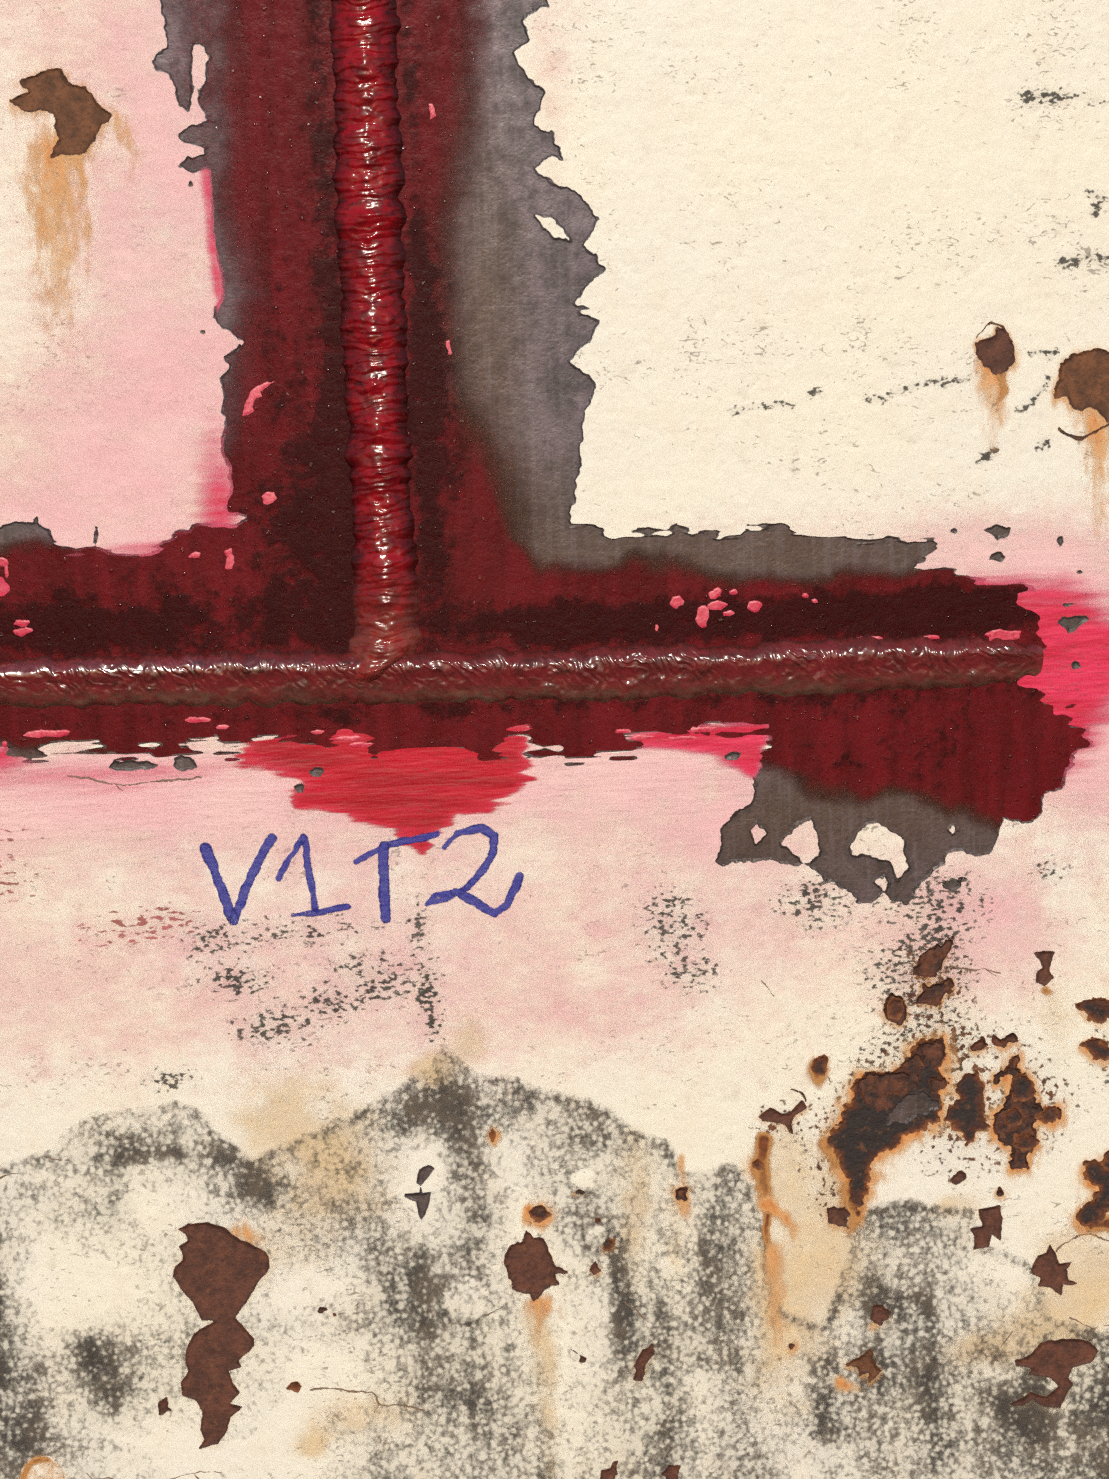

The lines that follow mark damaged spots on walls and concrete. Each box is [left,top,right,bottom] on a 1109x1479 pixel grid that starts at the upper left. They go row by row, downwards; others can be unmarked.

corrosion [9,68,131,292]
corrosion [975,321,1016,423]
corrosion [1052,348,1109,477]
peeling [942,877,967,890]
corrosion [1075,997,1109,1066]
corrosion [748,936,1080,1367]
corrosion [158,1222,270,1449]
mould [0,1053,777,1479]
corrosion [504,1203,568,1372]
mould [779,1200,1109,1479]
corrosion [958,1150,1109,1408]